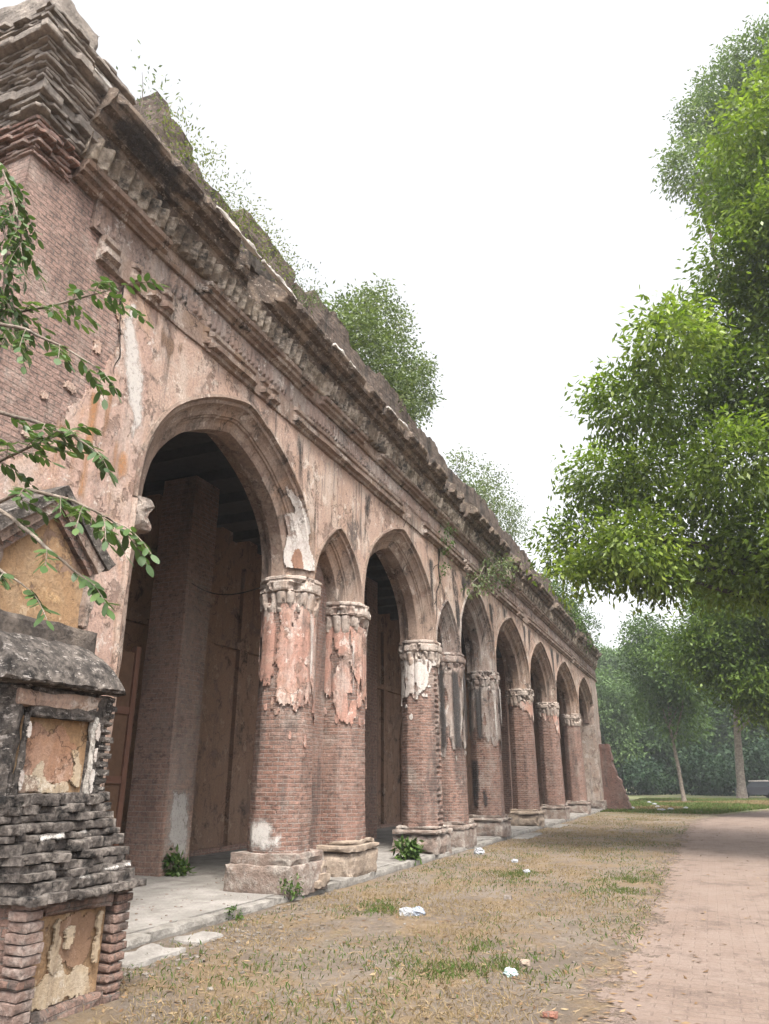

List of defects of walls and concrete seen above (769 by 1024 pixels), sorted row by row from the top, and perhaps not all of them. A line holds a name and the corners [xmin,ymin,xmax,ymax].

flaking render [18,721,101,794]
flaking render [258,603,367,726]
flaking render [401,659,561,762]
leakage [250,823,280,849]
flaking render [29,911,104,1012]